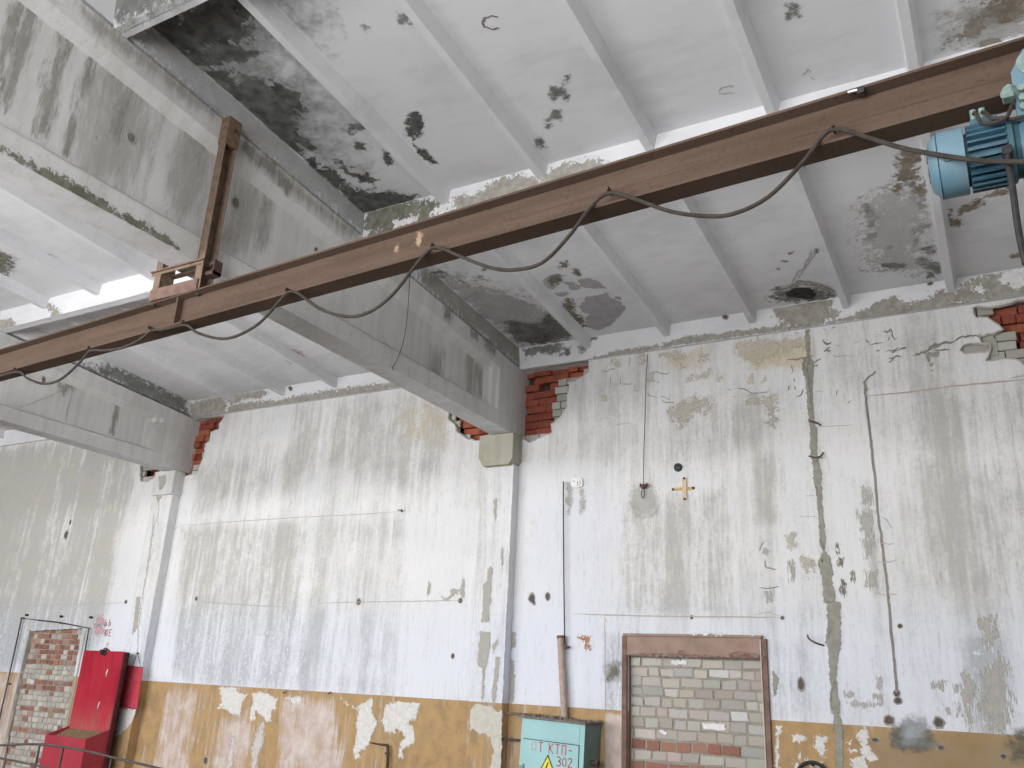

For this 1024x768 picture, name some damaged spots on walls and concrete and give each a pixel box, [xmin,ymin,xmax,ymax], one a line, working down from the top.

water stain [111,0,448,236]
water stain [886,151,927,196]
water stain [418,268,598,367]
water stain [548,260,581,286]
spalling [519,274,1024,443]
water stain [881,245,941,278]
peeling [185,382,398,477]
crack [729,327,1024,768]
peeling [469,548,516,768]
peeling [930,614,1019,737]
peeling [216,686,302,768]
peeling [340,696,421,760]